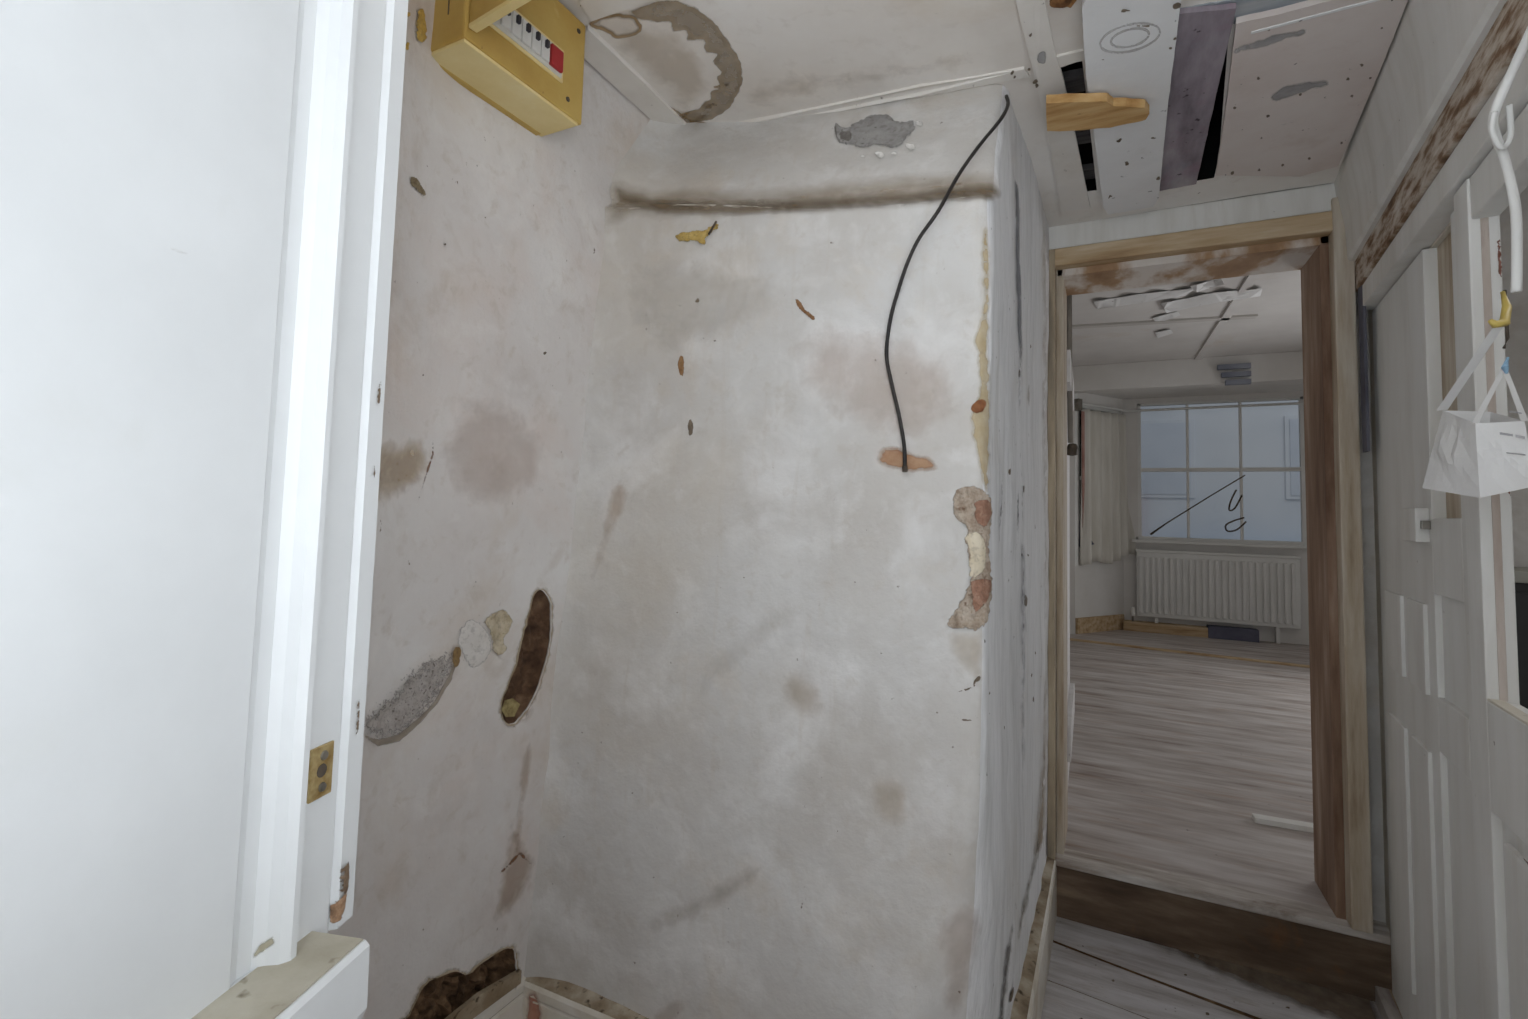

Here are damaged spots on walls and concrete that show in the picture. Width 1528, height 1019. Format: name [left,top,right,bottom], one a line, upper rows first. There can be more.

damp [590,1,743,123]
flaking render [835,114,923,158]
spalling [947,239,993,631]
spalling [485,589,553,726]
spalling [403,946,522,1019]